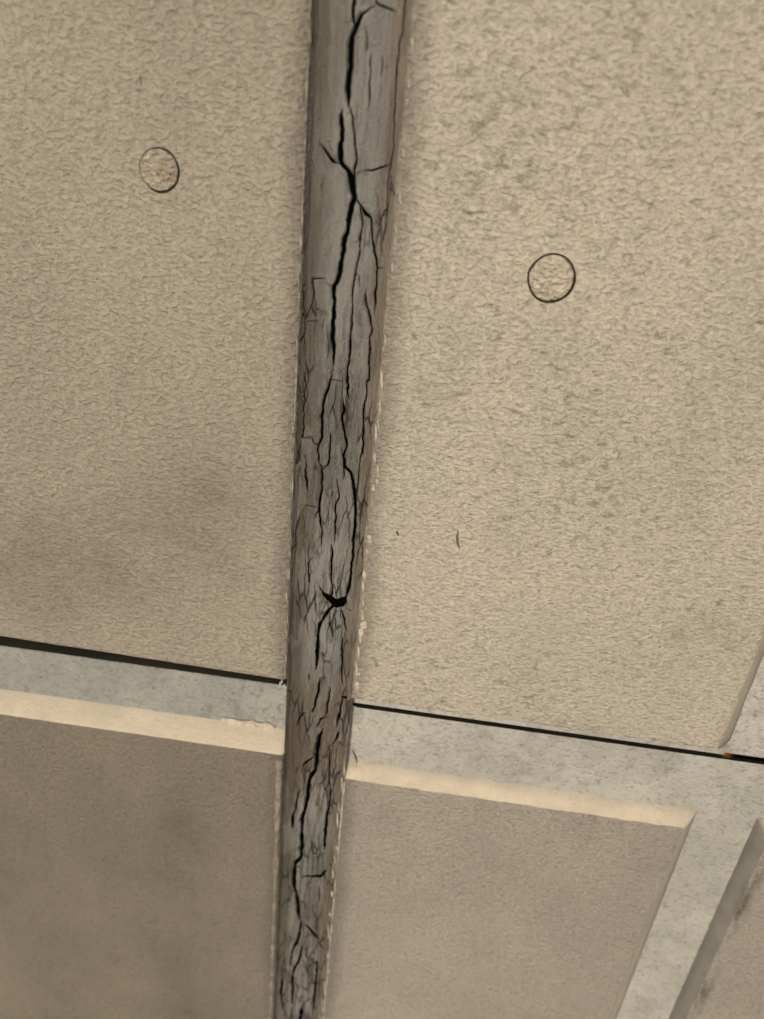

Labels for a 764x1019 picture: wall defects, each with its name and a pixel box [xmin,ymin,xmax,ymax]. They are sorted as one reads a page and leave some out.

crack [280,0,405,1019]